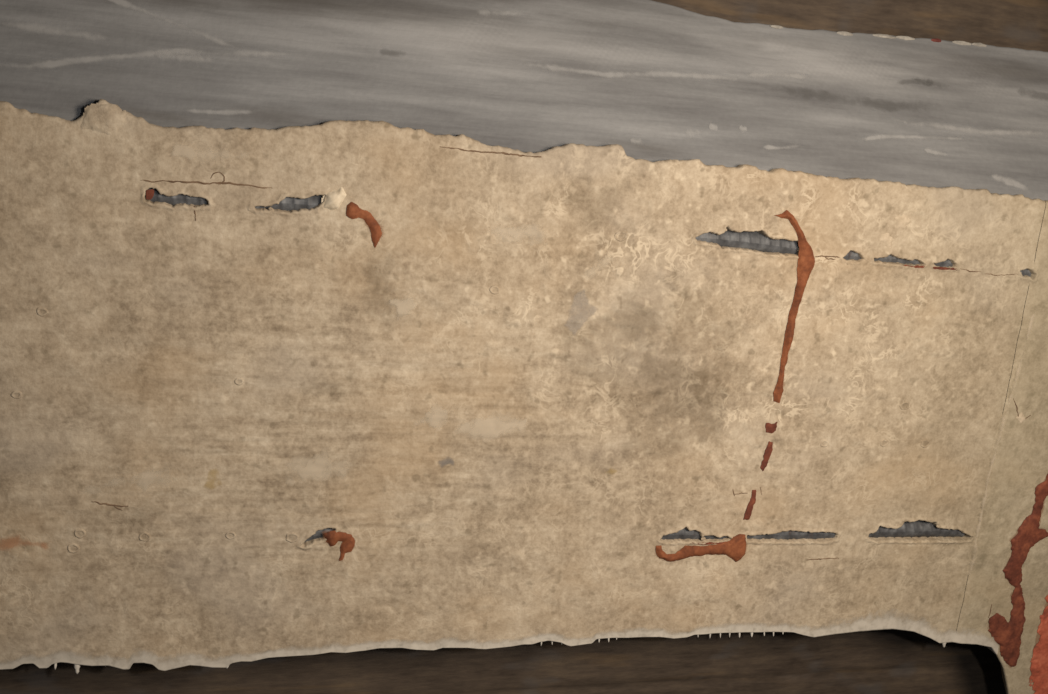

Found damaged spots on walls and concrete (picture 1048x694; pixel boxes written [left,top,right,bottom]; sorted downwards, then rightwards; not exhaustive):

spalling [139,182,216,213]
spalling [246,189,329,218]
rust [346,202,382,247]
spalling [691,221,799,261]
spalling [838,245,961,273]
rust [773,210,815,403]
rust [761,422,777,471]
rust [324,531,355,561]
rust [656,534,746,562]
spalling [655,523,842,547]
spalling [864,516,976,546]
rust [988,474,1048,694]